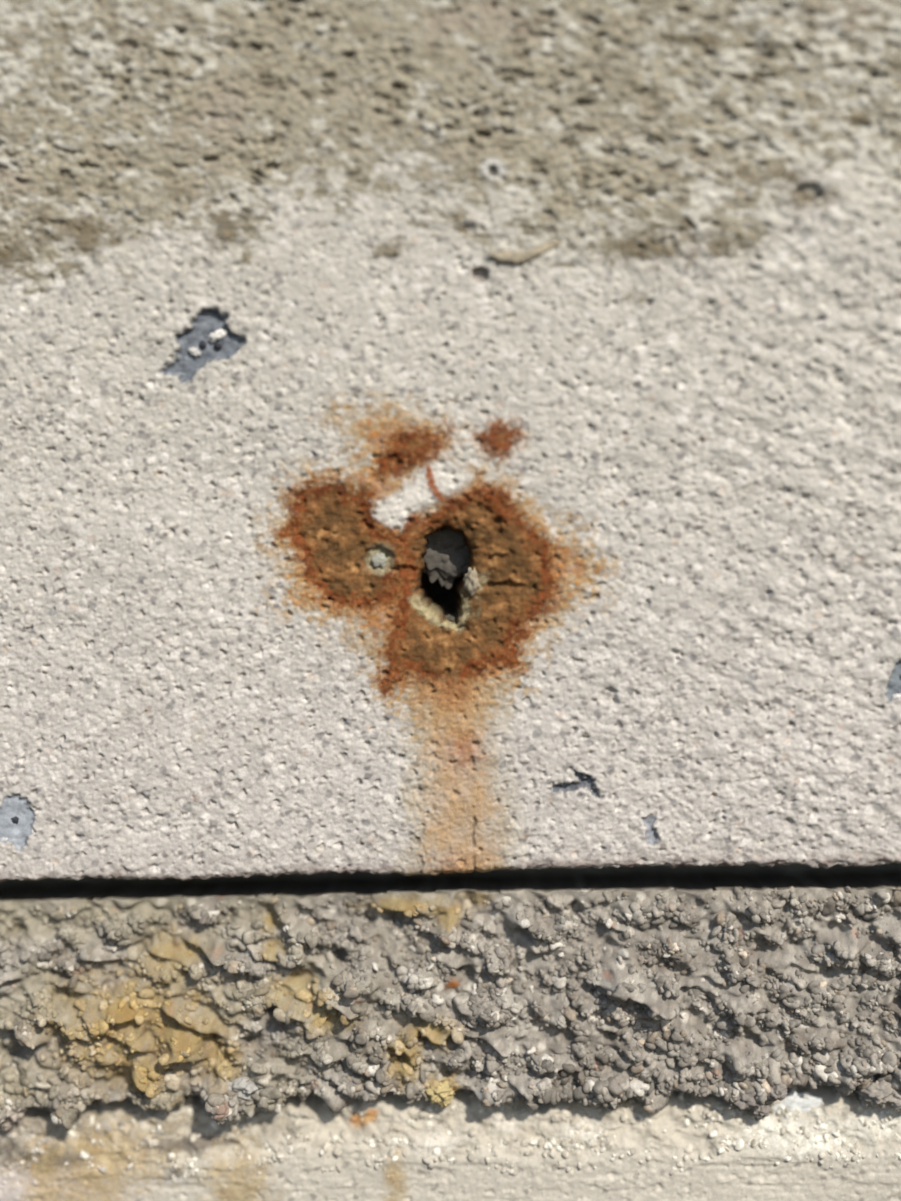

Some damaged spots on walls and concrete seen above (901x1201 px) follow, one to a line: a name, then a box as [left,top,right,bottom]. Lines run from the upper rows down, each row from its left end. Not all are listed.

peeling [161,309,246,383]
rust [274,403,606,874]
peeling [886,660,901,701]
peeling [0,795,35,850]